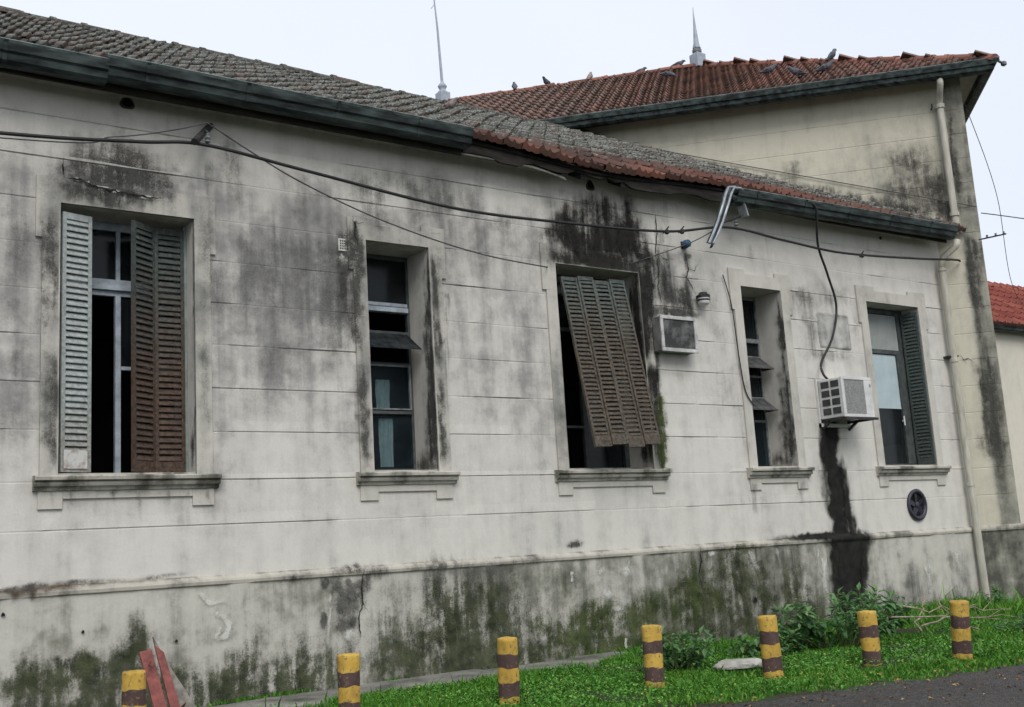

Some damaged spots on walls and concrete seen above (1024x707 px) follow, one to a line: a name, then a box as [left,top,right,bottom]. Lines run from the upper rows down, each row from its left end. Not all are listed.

leakage [62,143,170,208]
leakage [965,237,1007,468]
leakage [786,421,873,620]
crack [358,571,368,638]
leakage [345,564,387,590]